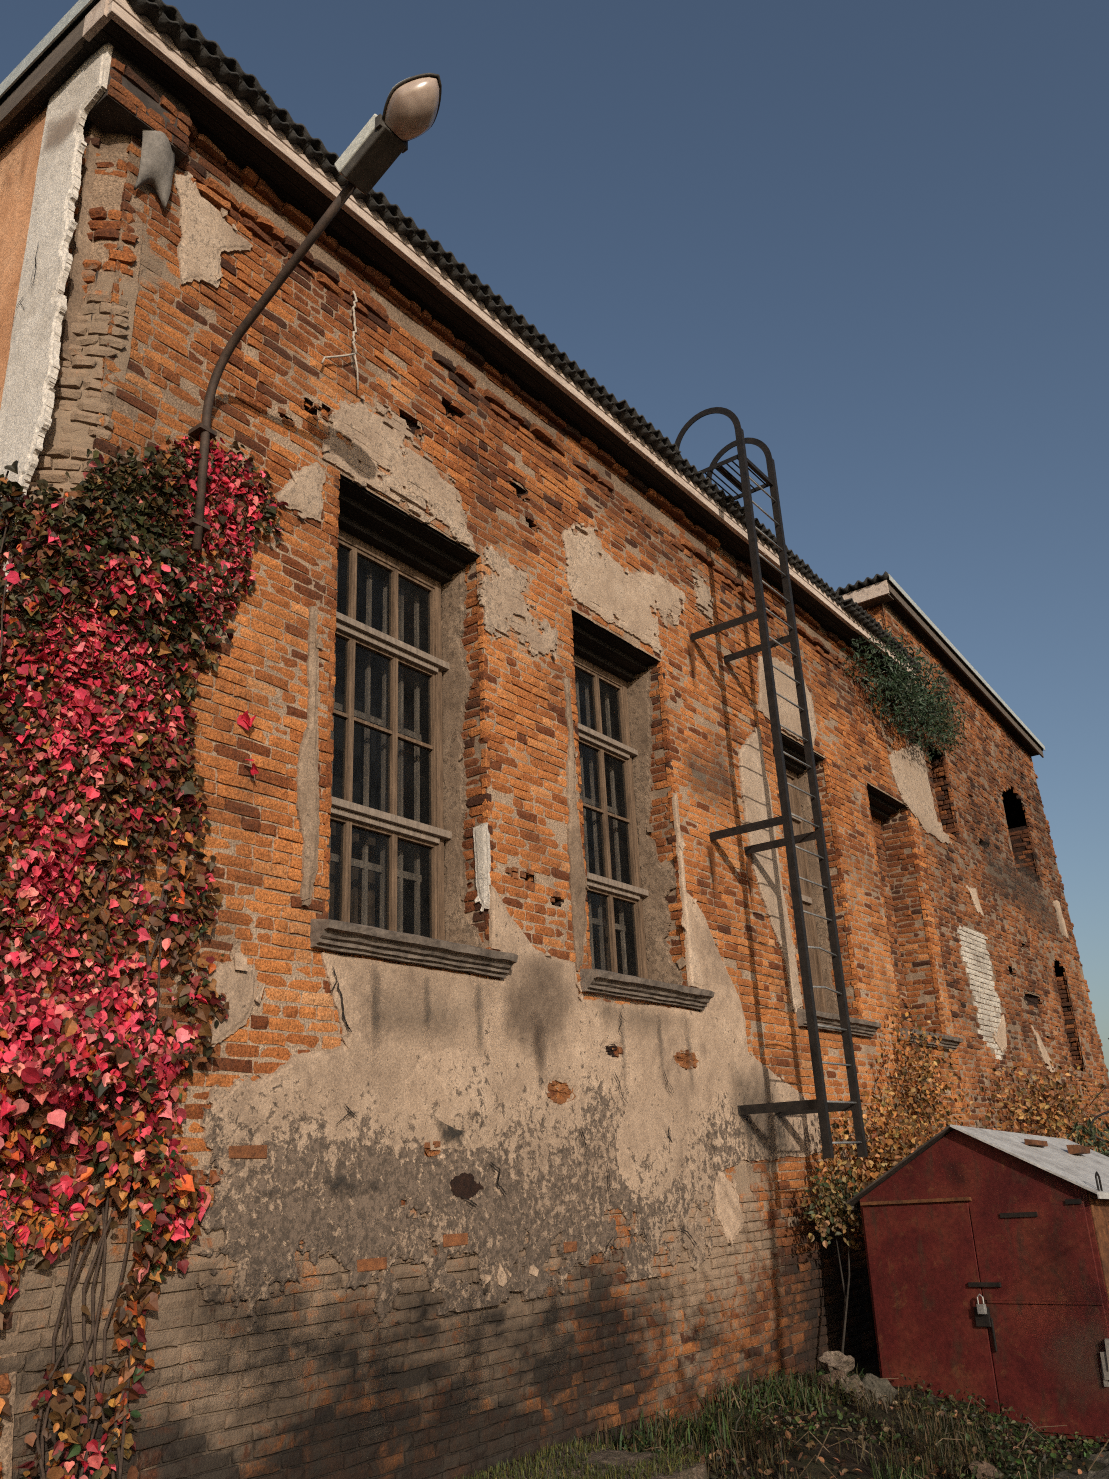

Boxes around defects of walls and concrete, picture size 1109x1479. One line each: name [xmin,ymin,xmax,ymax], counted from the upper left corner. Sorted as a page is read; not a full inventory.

flaking render [174,171,253,289]
flaking render [888,743,952,844]
flaking render [177,395,822,1332]
flaking render [992,1014,1007,1052]
water stain [440,1121,463,1142]